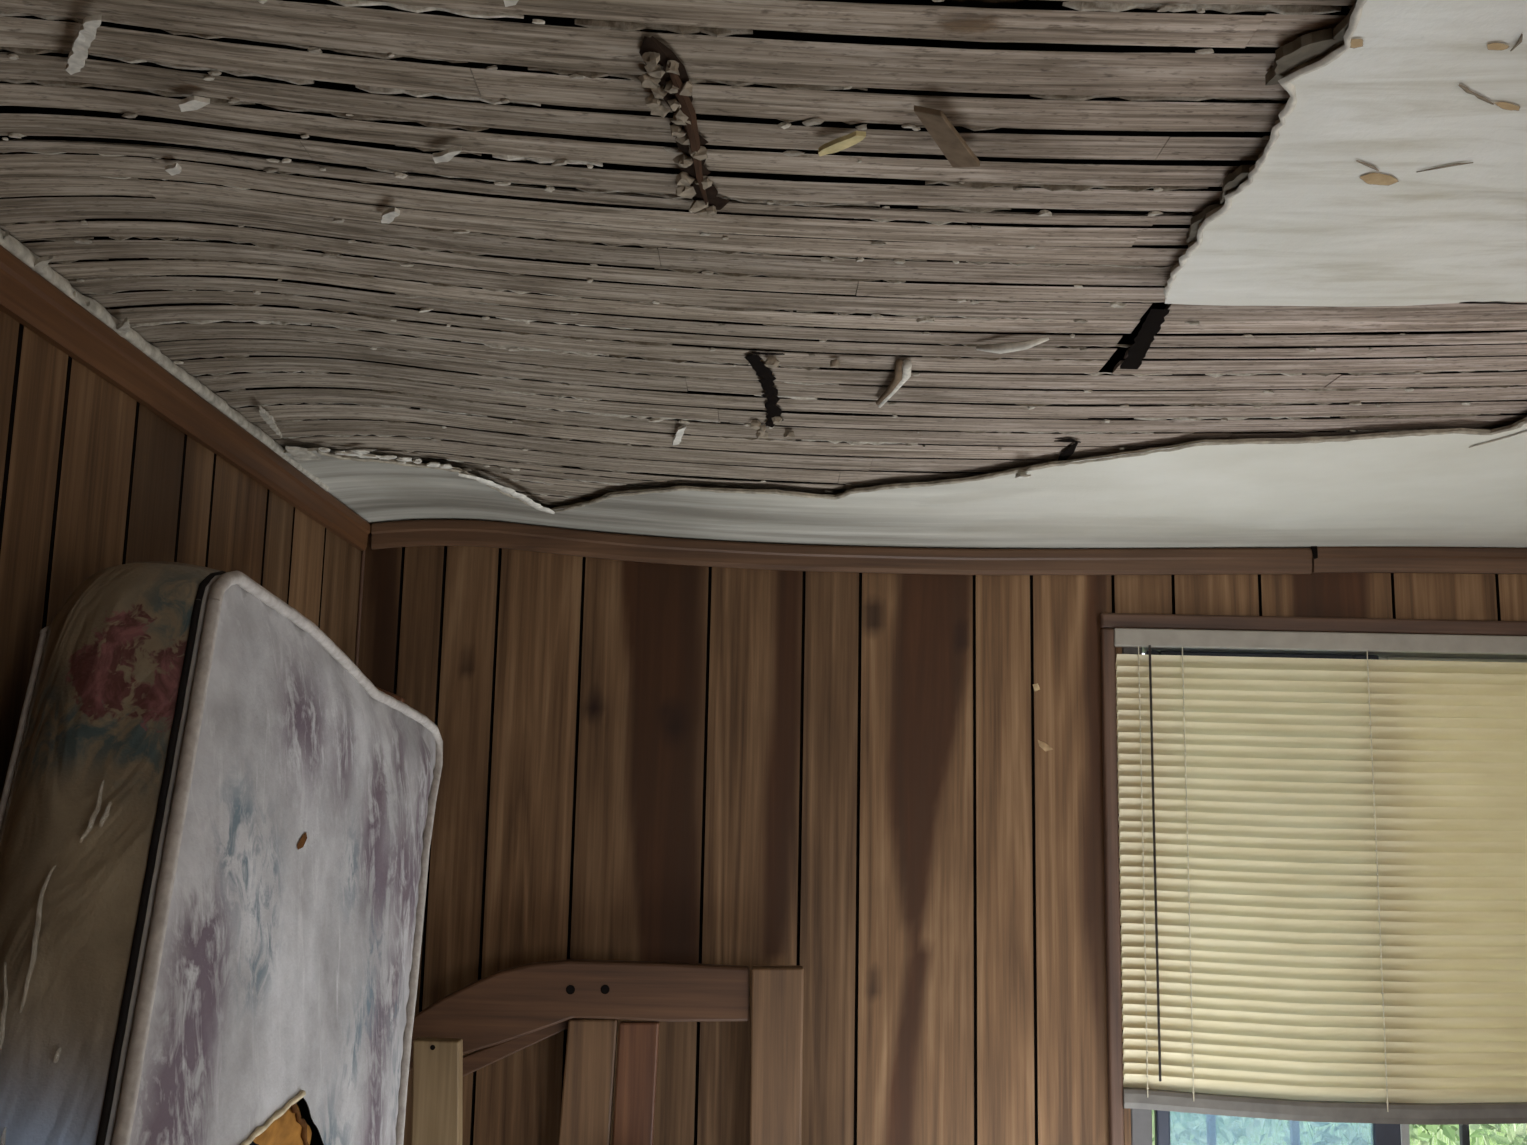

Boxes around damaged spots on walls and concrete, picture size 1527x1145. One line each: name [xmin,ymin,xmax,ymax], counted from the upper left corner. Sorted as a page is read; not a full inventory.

peeling [65,15,102,75]
peeling [179,96,210,112]
peeling [1495,102,1520,111]
peeling [818,131,866,156]
peeling [433,146,462,164]
peeling [165,162,181,176]
spalling [1120,0,1367,369]
peeling [1360,173,1398,186]
peeling [381,207,400,224]
peeling [0,228,1527,514]
crack [744,352,795,439]